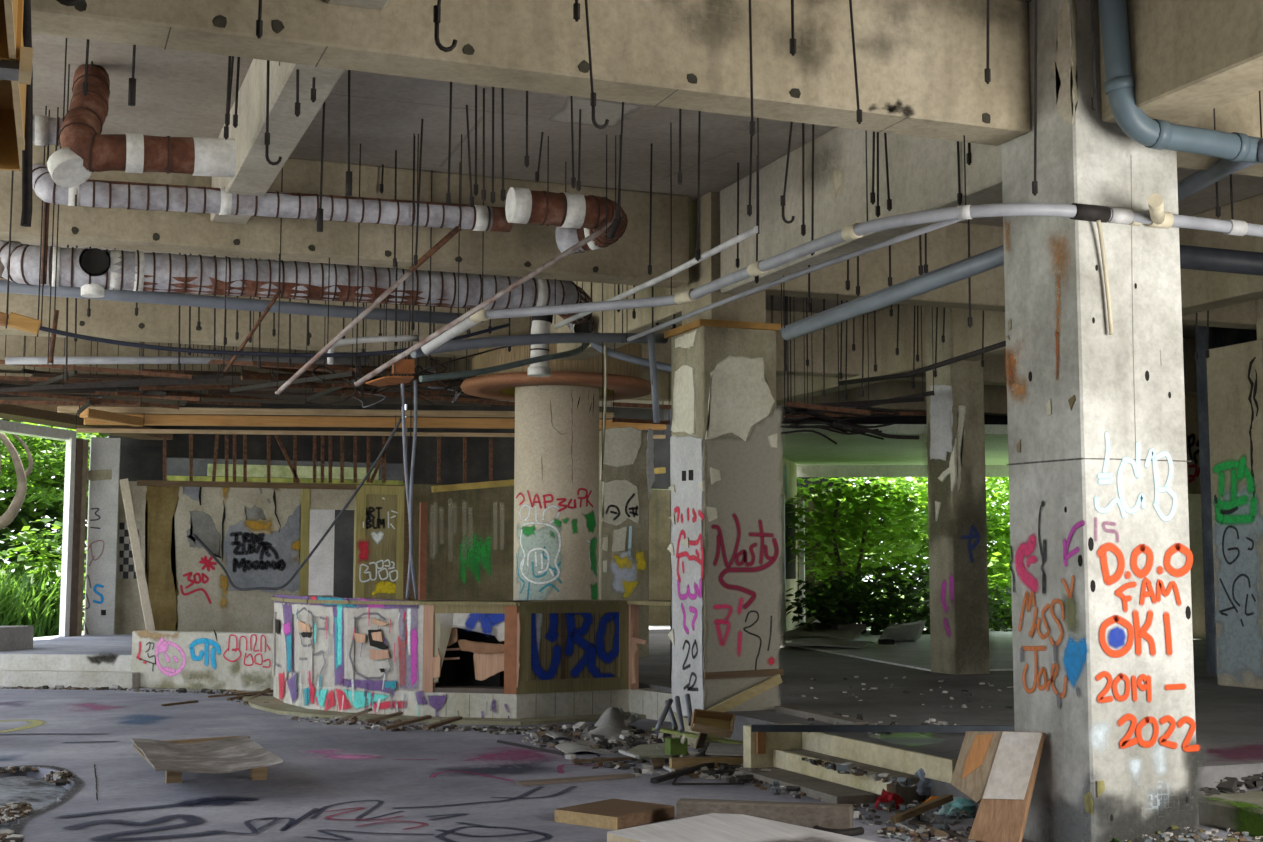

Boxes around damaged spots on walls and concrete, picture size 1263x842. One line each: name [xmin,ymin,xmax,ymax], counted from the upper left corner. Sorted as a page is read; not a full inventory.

peeling [675,329,699,349]
corrosion [1054,242,1065,379]
peeling [602,426,655,572]
peeling [667,355,775,719]
peeling [768,433,778,448]